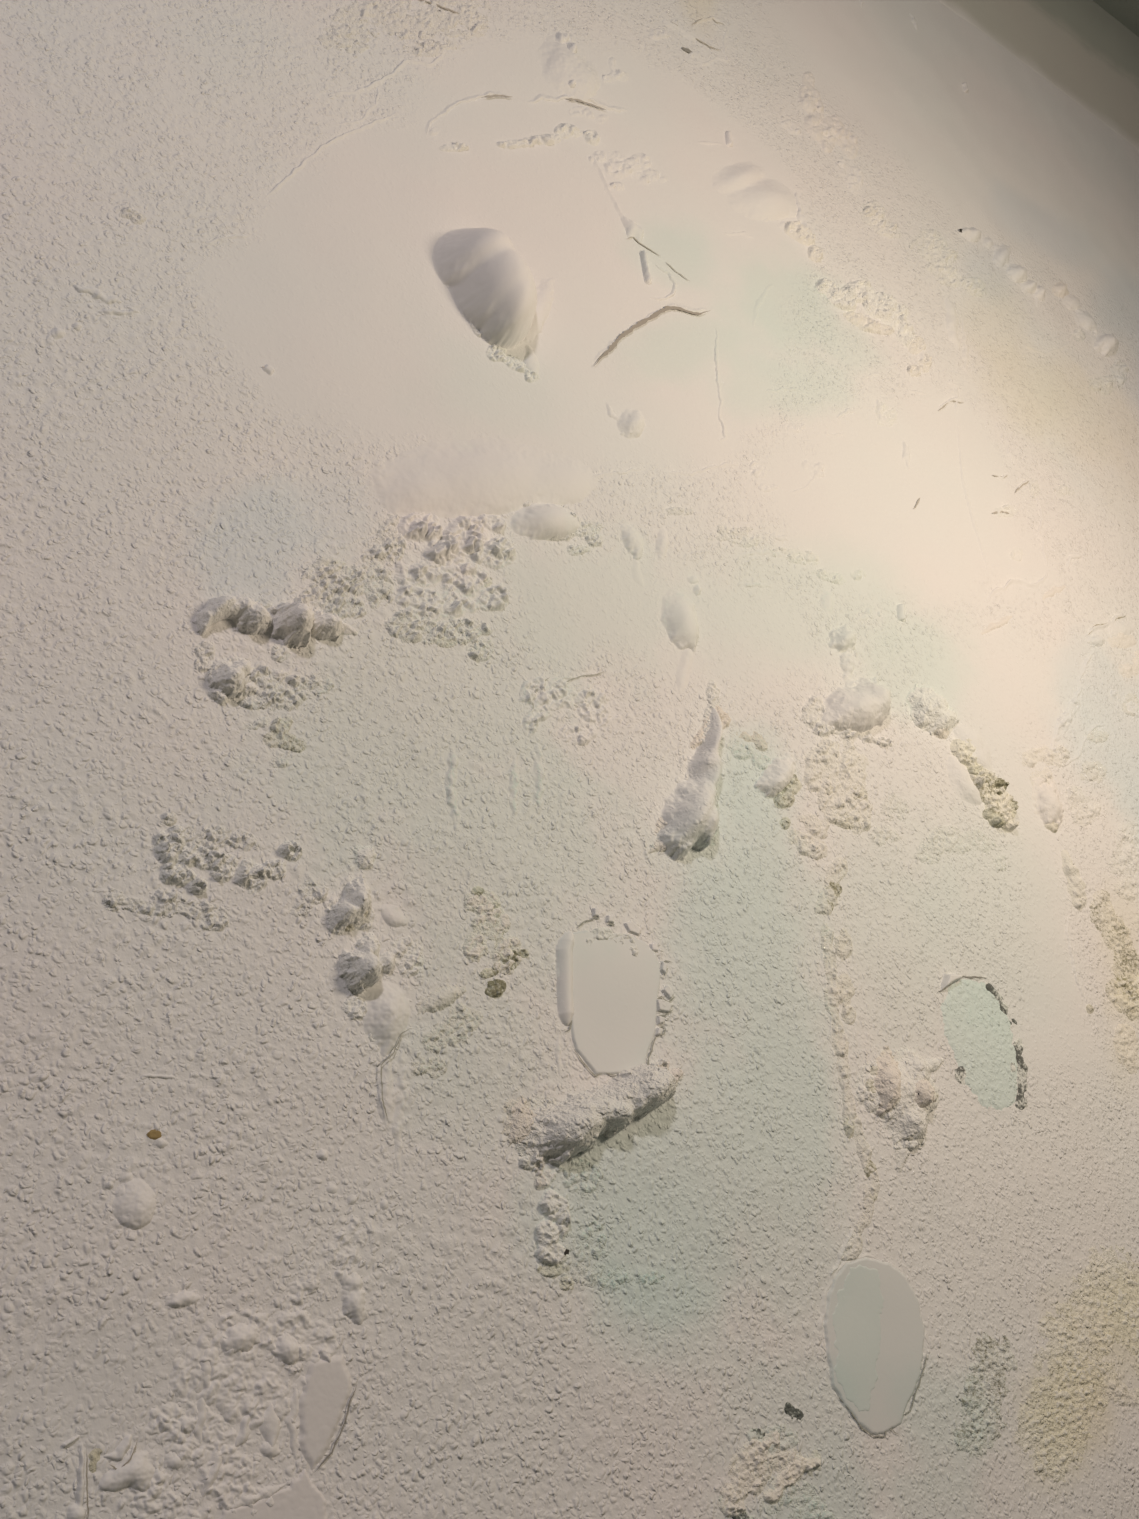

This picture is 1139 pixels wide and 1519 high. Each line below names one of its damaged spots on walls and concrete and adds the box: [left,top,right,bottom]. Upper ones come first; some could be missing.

peeling [937,973,1028,1111]
flaking render [61,1183,388,1519]